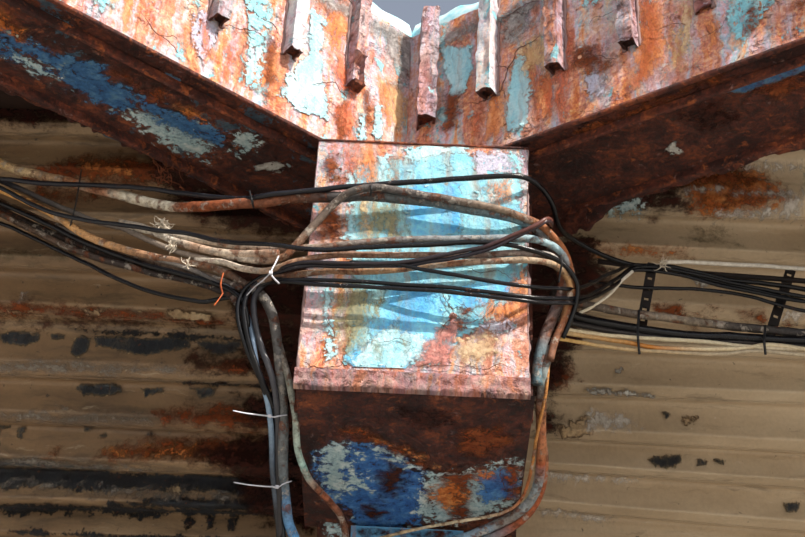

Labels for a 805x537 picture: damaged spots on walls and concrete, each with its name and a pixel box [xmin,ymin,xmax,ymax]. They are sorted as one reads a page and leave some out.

peeling [0,30,264,165]
rust [188,208,304,240]
peeling [321,145,525,214]
rust [546,136,805,313]
peeling [0,307,241,359]
rust [100,268,313,533]
peeling [319,201,528,368]
rust [485,232,558,358]
rust [548,321,583,392]
peeling [0,460,275,537]
peeling [309,440,525,528]
rust [338,426,524,537]